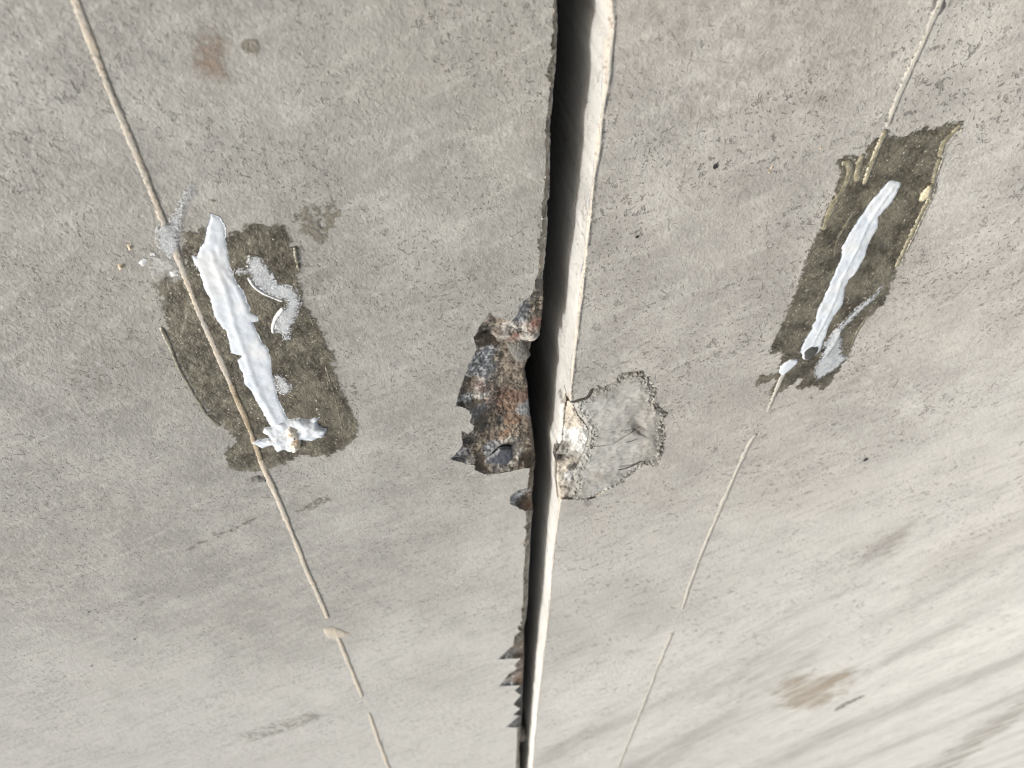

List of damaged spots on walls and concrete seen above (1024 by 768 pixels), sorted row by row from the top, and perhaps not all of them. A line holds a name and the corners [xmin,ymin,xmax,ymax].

leakage [154,201,358,472]
spalling [450,0,558,768]
spalling [552,393,589,500]
crack [570,388,594,403]
crack [585,426,642,470]
leakage [755,121,964,412]